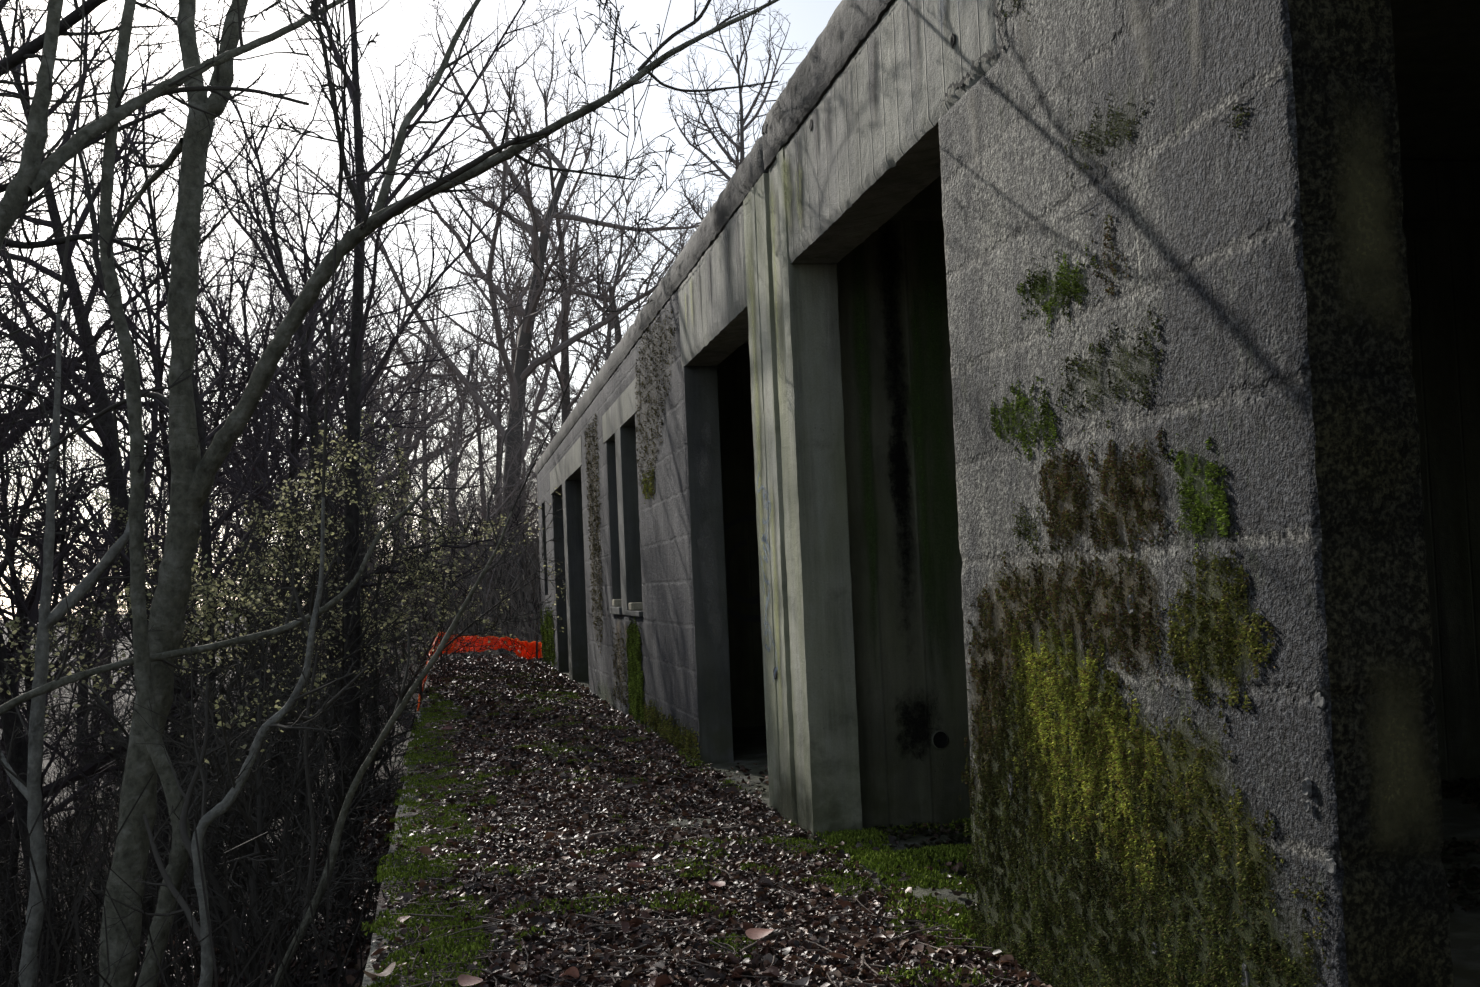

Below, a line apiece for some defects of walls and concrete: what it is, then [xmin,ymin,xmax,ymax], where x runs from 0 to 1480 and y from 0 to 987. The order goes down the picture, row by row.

damp [771,104,828,368]
damp [854,223,956,621]